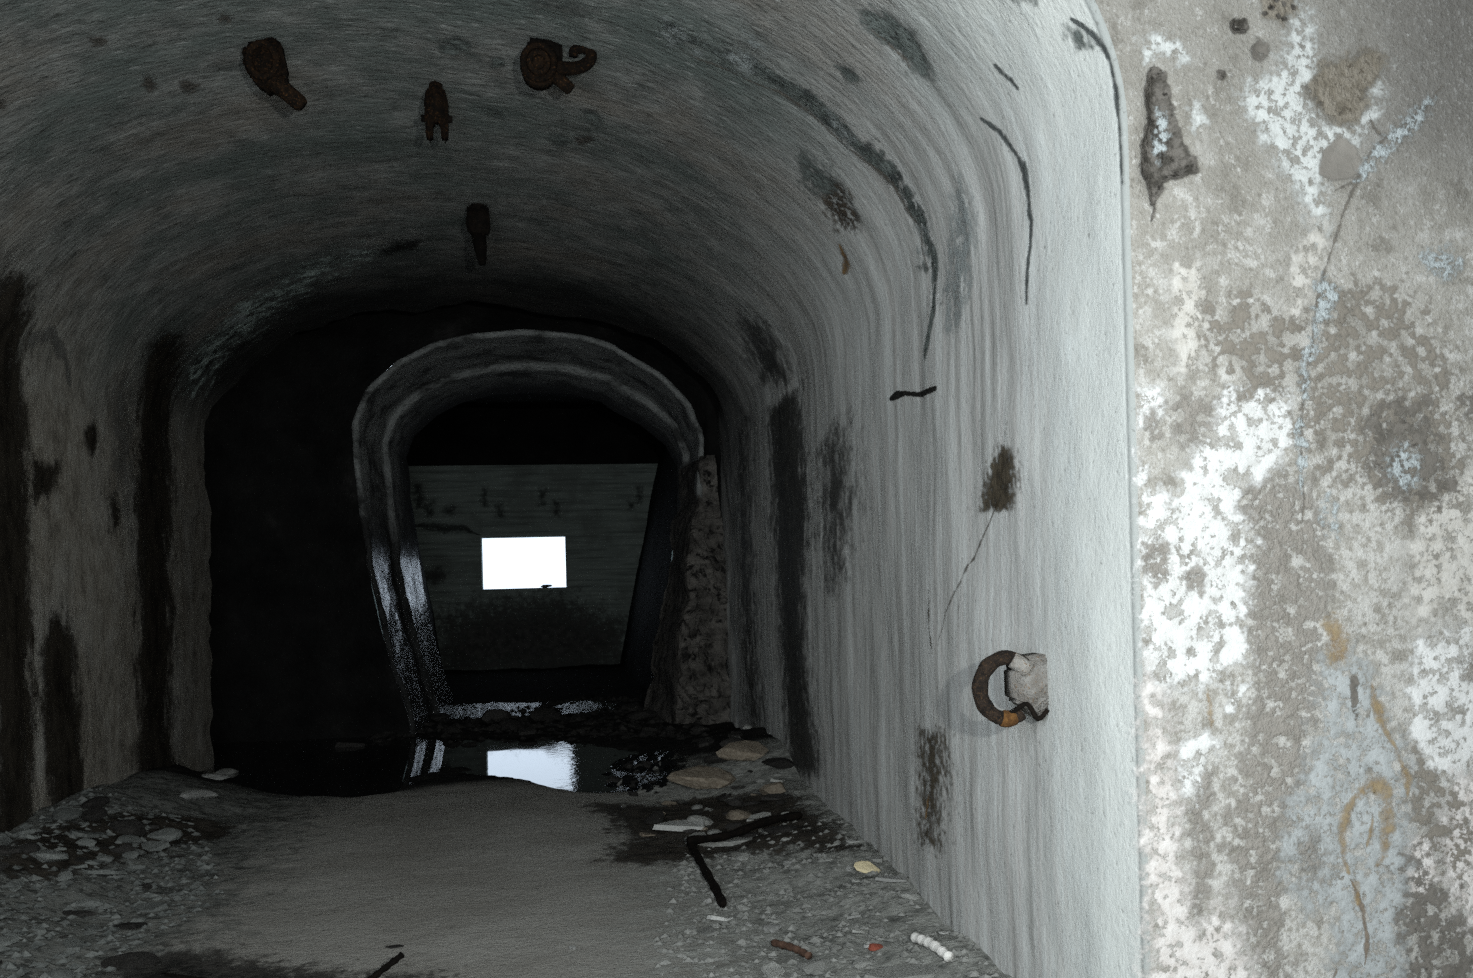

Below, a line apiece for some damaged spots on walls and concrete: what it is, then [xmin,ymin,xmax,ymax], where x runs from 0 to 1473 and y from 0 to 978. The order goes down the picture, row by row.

leakage [0,264,237,881]
leakage [107,239,424,771]
spalling [1140,32,1209,222]
peeling [1230,0,1388,335]
leakage [1197,259,1473,539]
leakage [1419,248,1463,280]
leakage [1276,652,1473,978]